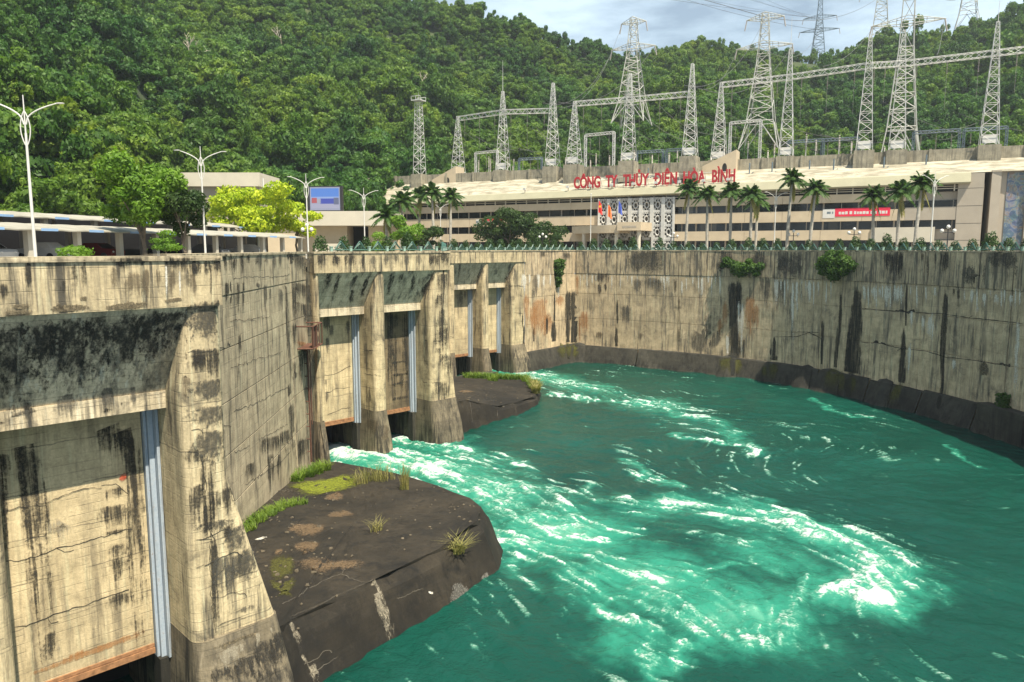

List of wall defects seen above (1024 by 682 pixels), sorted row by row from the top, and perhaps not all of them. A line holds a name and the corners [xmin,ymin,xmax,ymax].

water stain [521,251,668,359]
water stain [681,250,745,375]
water stain [751,251,1021,409]
water stain [0,253,461,626]
crack [3,484,128,512]
crack [6,529,128,562]
water stain [43,632,55,659]
crack [16,589,129,627]